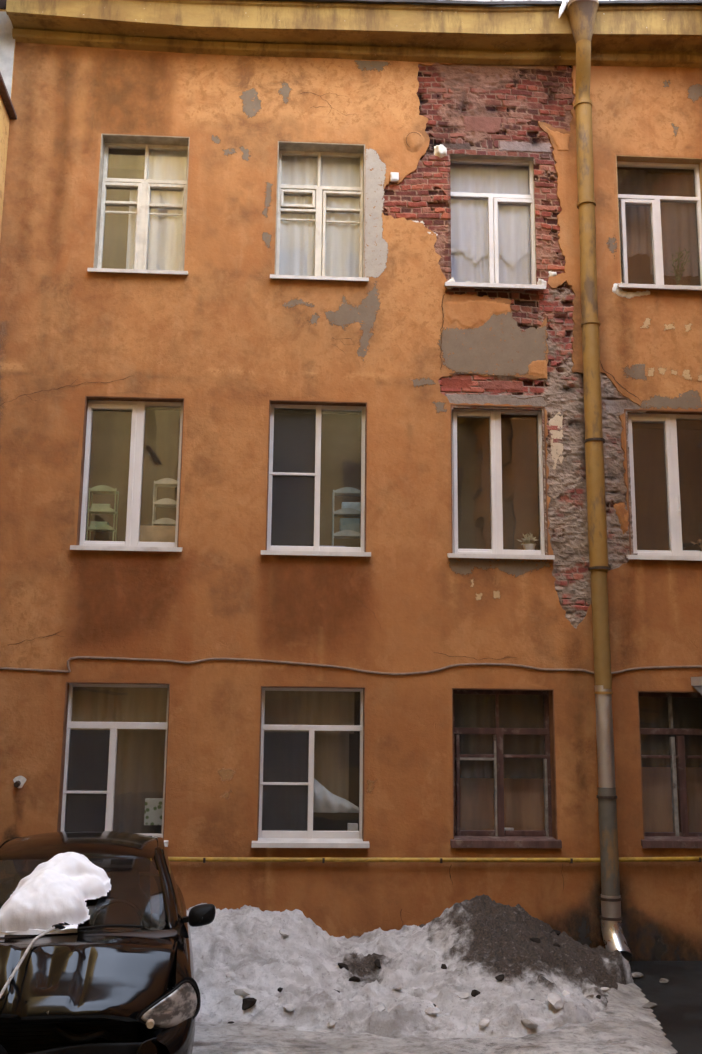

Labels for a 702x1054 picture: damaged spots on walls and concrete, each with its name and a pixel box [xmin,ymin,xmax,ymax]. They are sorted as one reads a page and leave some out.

peeling [239,88,261,118]
peeling [278,82,292,104]
flaking render [282,63,591,629]
spalling [600,363,702,570]
leakage [545,882,606,949]
leakage [620,882,702,961]